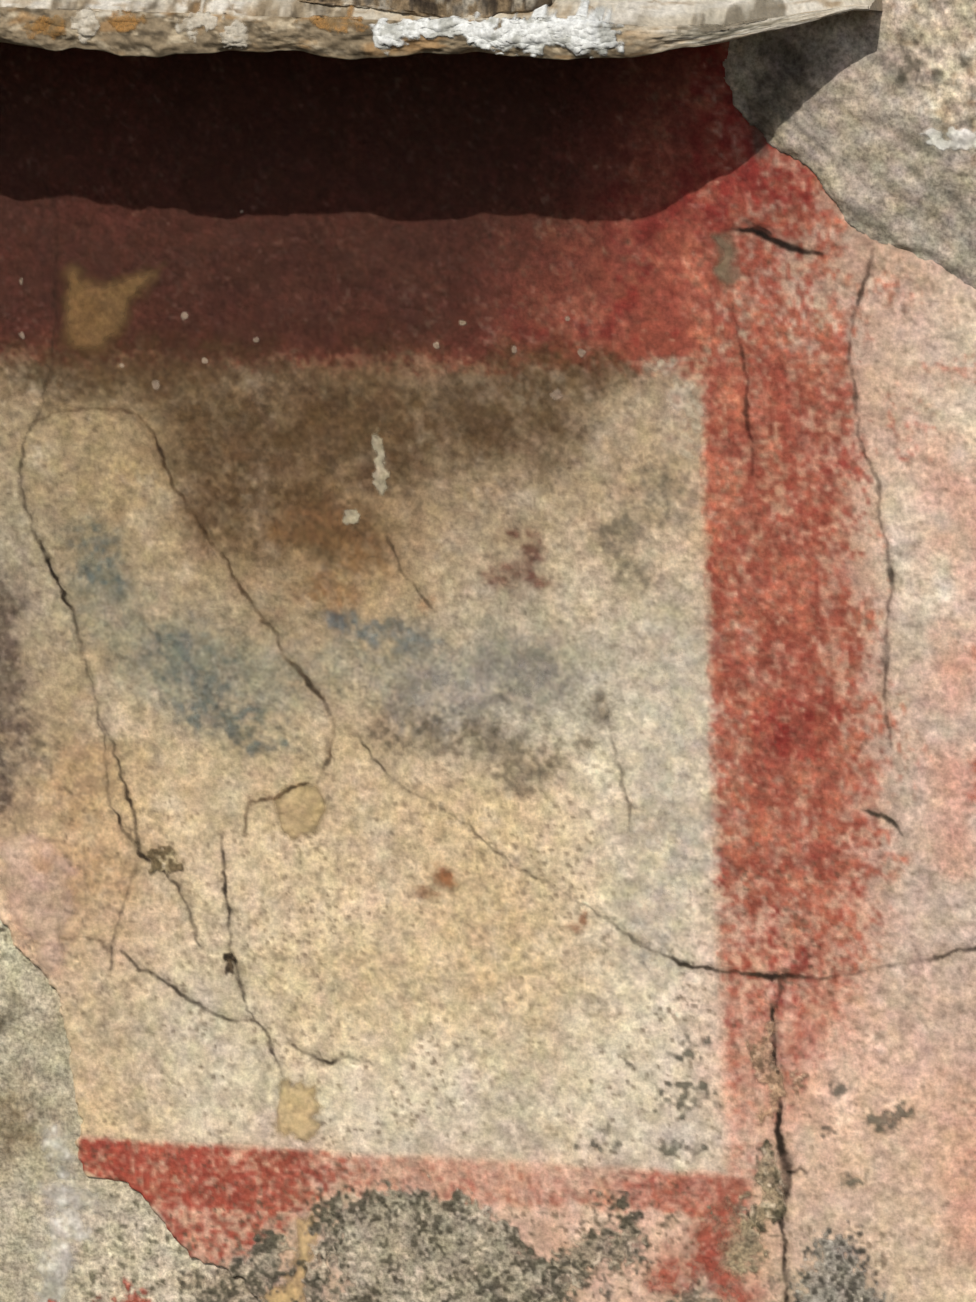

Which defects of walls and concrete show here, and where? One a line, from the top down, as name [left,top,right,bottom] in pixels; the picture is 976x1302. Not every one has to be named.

crack [736,225,823,255]
crack [39,541,72,610]
crack [226,558,324,700]
crack [116,759,179,890]
crack [257,752,331,802]
crack [866,809,898,828]
crack [222,850,231,920]
crack [126,955,337,1065]
flaking render [666,1022,808,1302]
crack [668,956,825,1302]
flaking render [177,1176,653,1302]
flaking render [790,1221,885,1302]